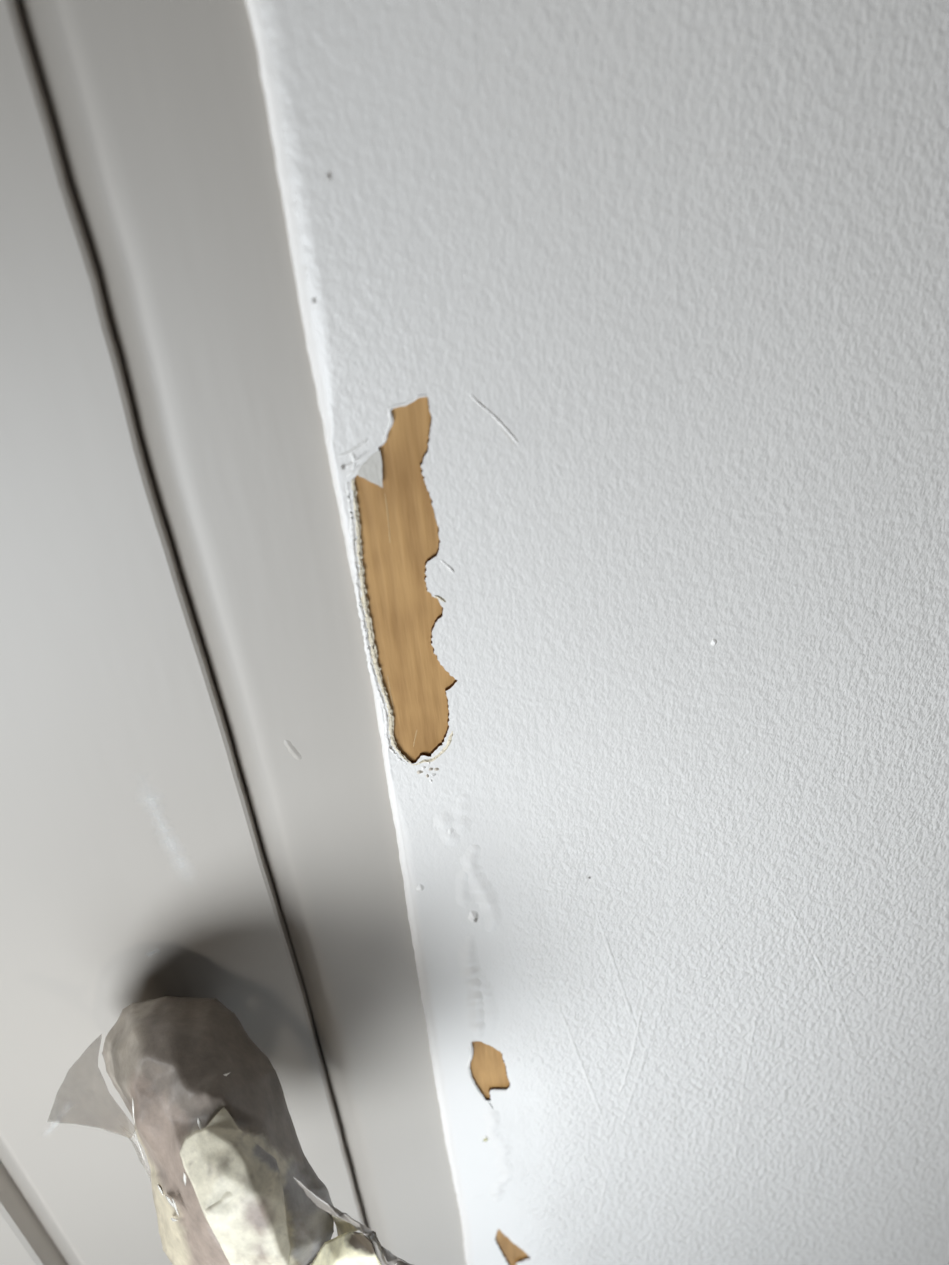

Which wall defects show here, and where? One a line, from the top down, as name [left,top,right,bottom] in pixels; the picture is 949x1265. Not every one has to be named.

peeling [338,394,455,783]
peeling [467,1040,511,1108]
peeling [495,1229,529,1265]